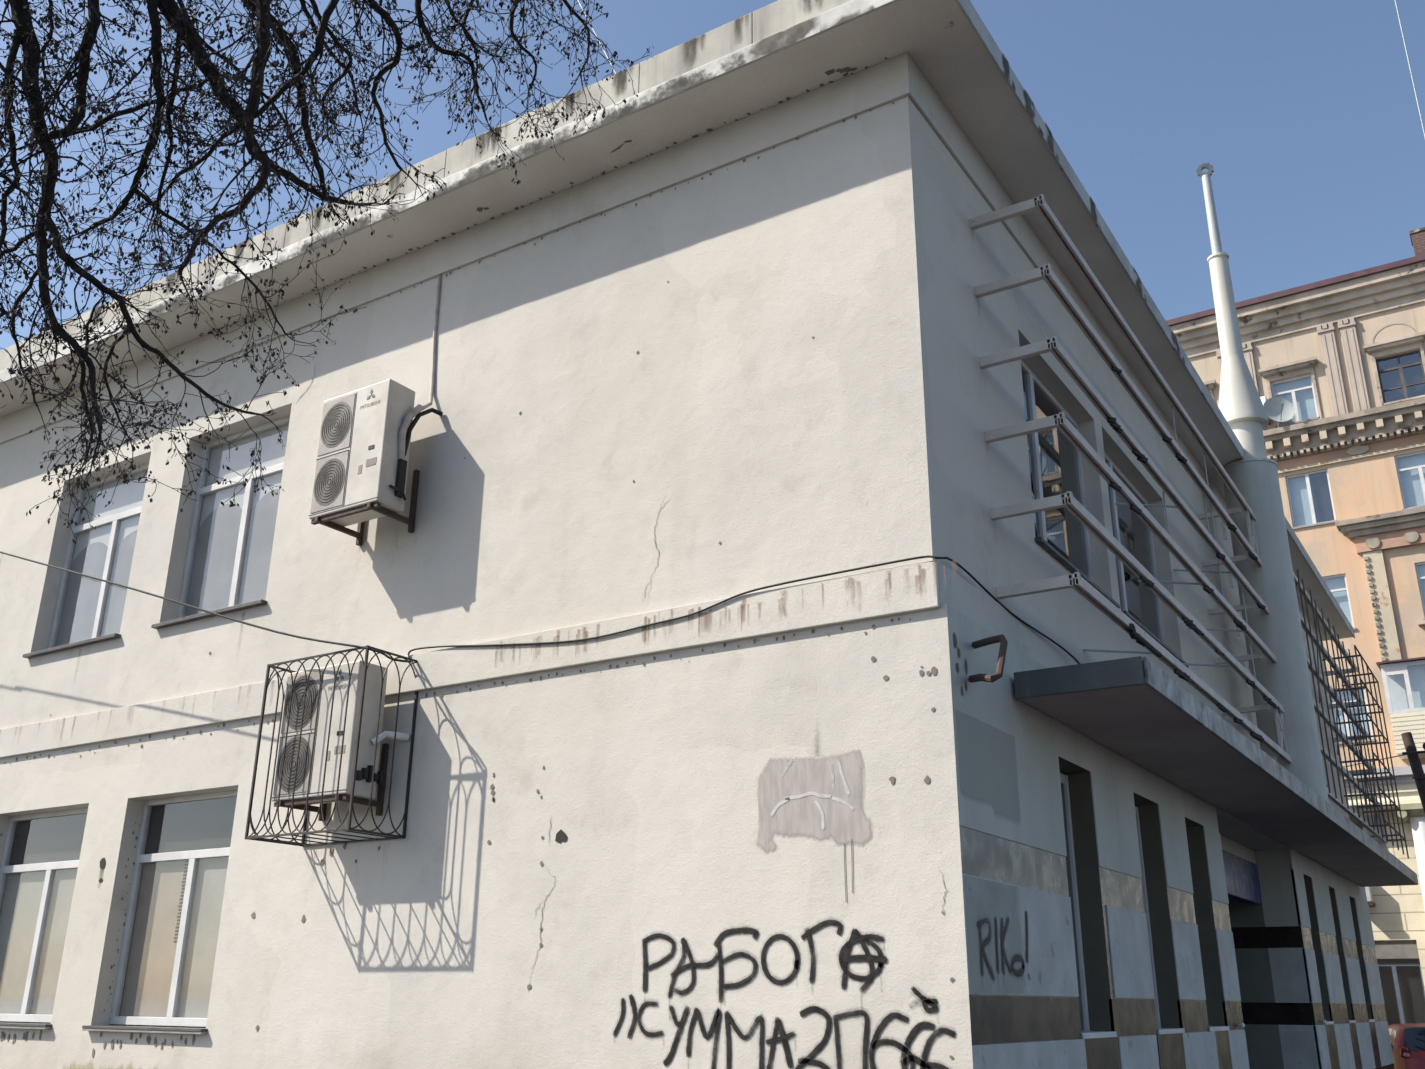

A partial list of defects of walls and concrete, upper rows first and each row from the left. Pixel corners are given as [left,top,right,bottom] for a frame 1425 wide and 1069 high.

leakage [684,34,704,54]
leakage [614,69,626,92]
leakage [587,108,627,131]
leakage [476,126,500,151]
crack [642,484,669,601]